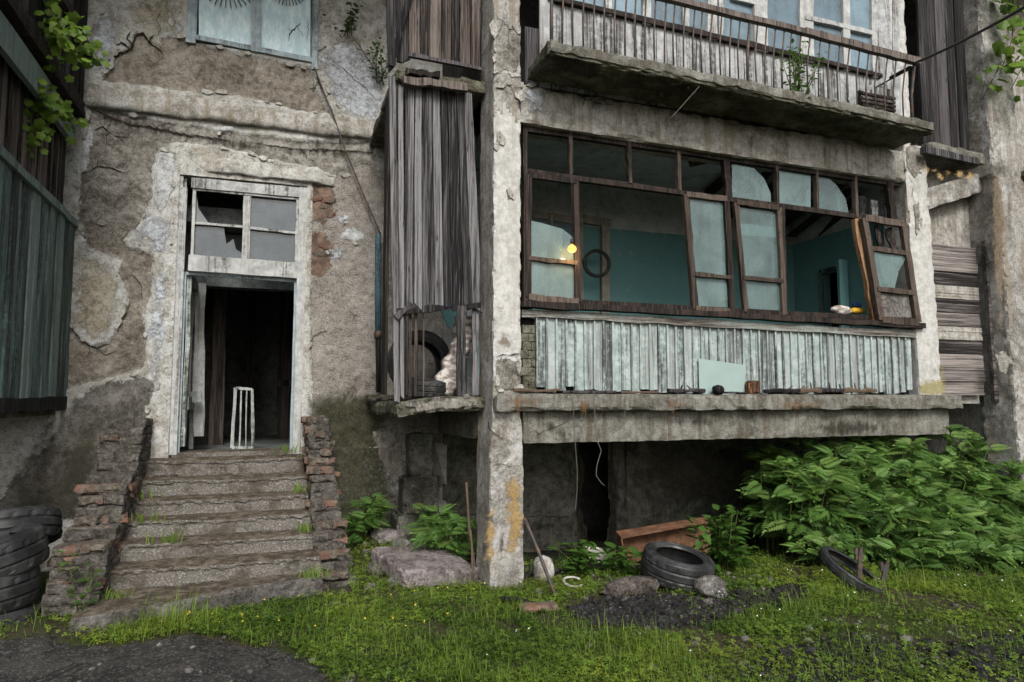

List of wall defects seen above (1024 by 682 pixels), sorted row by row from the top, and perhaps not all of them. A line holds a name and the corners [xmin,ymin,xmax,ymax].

crack [108,4,163,61]
peeling [92,10,384,123]
spalling [489,15,544,111]
peeling [68,108,477,490]
spalling [495,358,524,392]
spalling [995,351,1011,374]
damp [310,386,397,541]
rust [485,510,496,558]
rust [506,479,523,552]